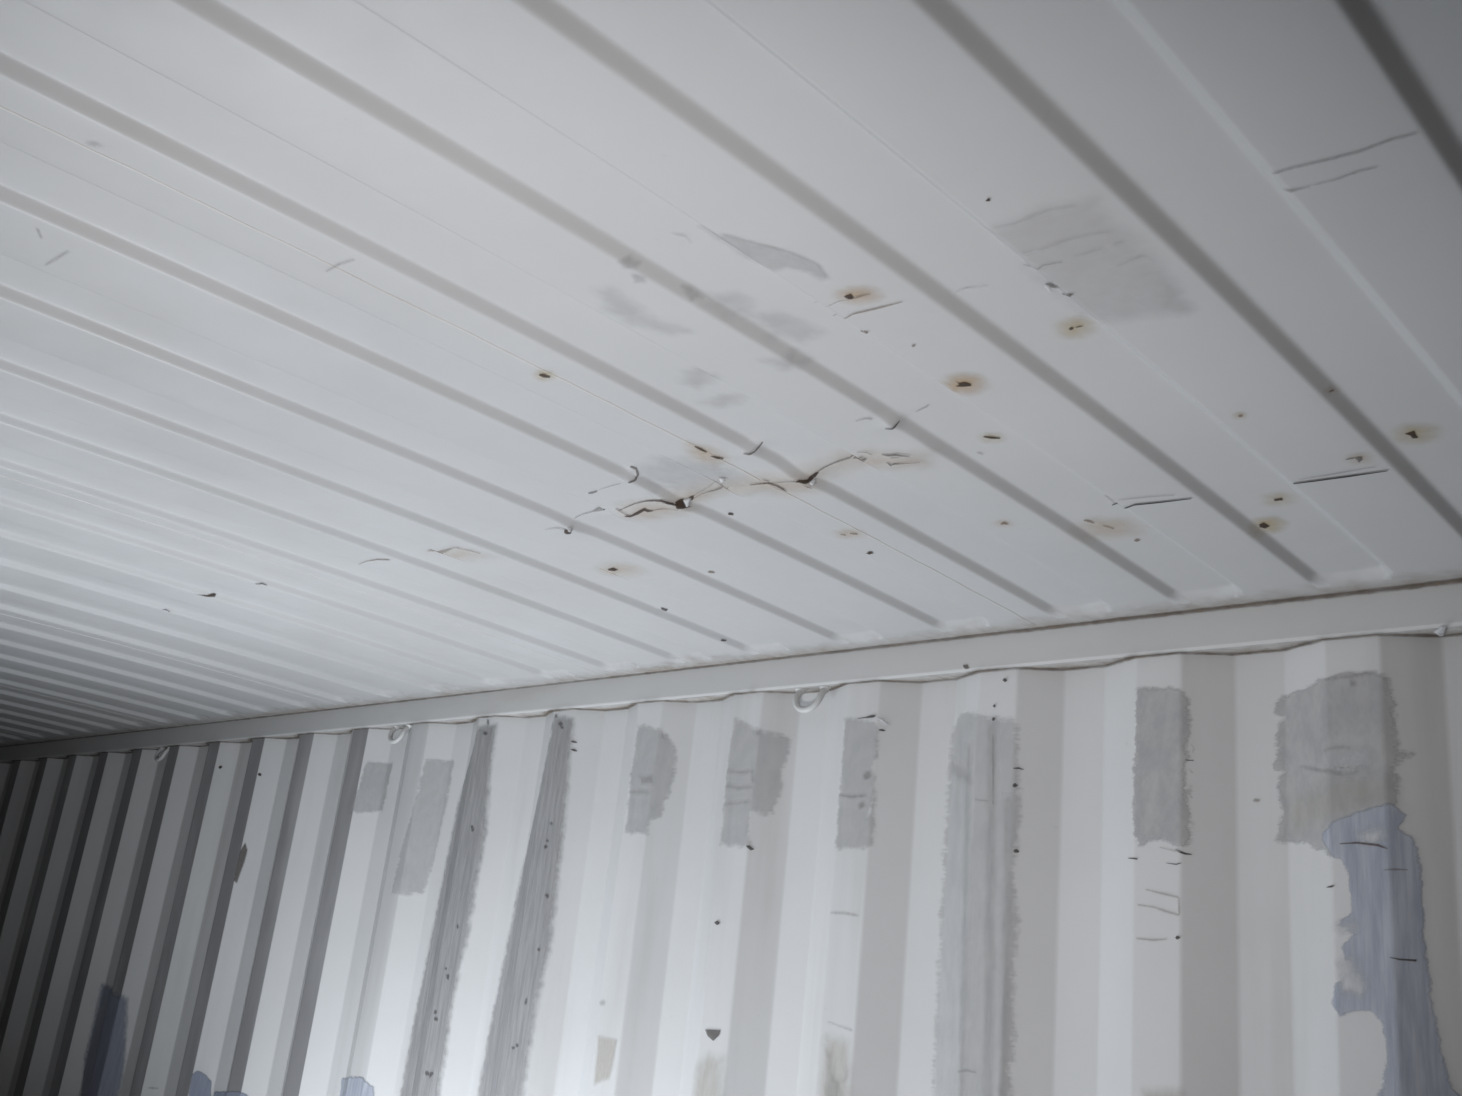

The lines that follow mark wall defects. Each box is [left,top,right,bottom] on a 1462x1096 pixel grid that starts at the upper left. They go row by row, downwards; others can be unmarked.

crack [554,452,919,534]